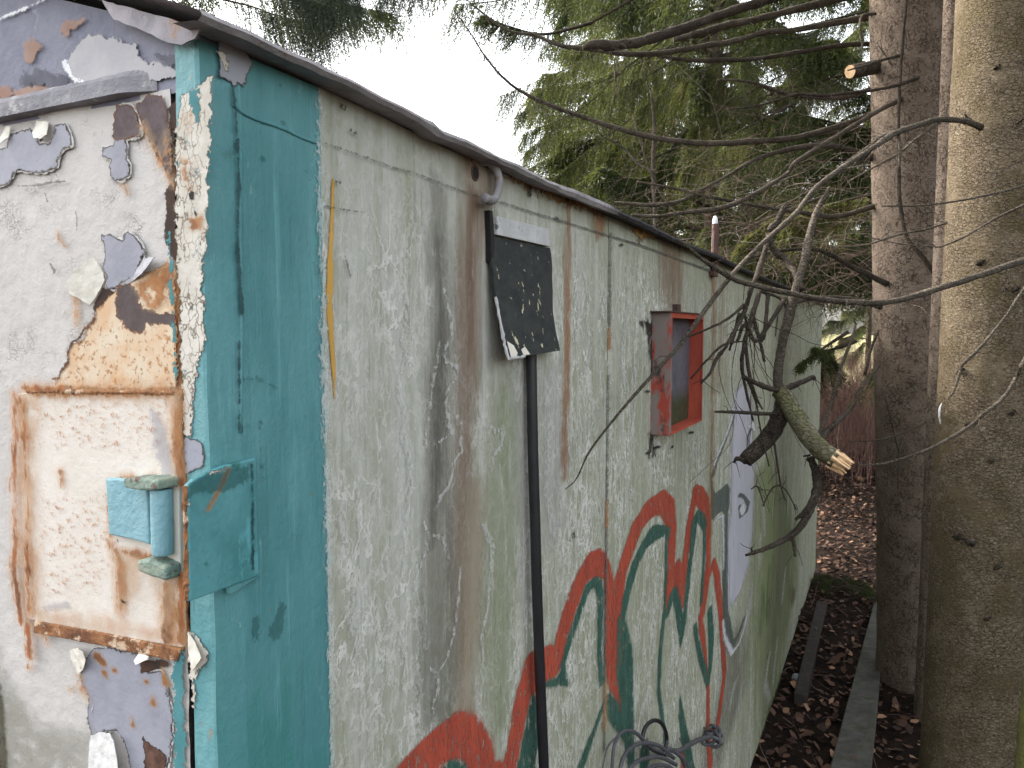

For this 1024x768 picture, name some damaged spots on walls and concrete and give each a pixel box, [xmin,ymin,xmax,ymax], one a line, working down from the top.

peeling [0,17,176,99]
peeling [0,121,74,188]
peeling [101,102,144,183]
peeling [64,230,155,326]
peeling [173,41,253,476]
leakage [425,288,463,503]
corrosion [562,278,570,479]
corrosion [9,258,186,670]
leakage [430,484,495,716]
peeling [68,645,175,768]
peeling [186,631,209,709]